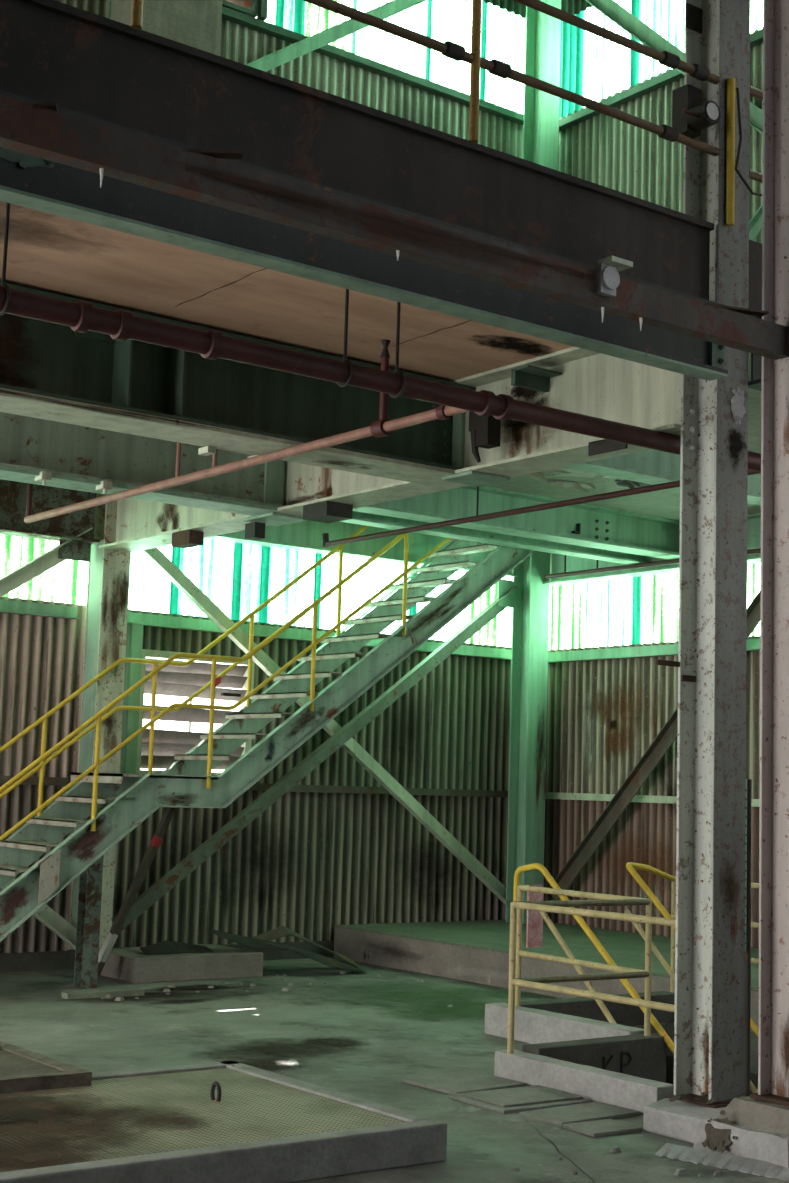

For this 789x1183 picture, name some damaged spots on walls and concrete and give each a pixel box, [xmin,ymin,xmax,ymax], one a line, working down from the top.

rust [157,503,178,532]
rust [103,576,127,662]
damp [210,1038,361,1071]
damp [0,1096,198,1172]